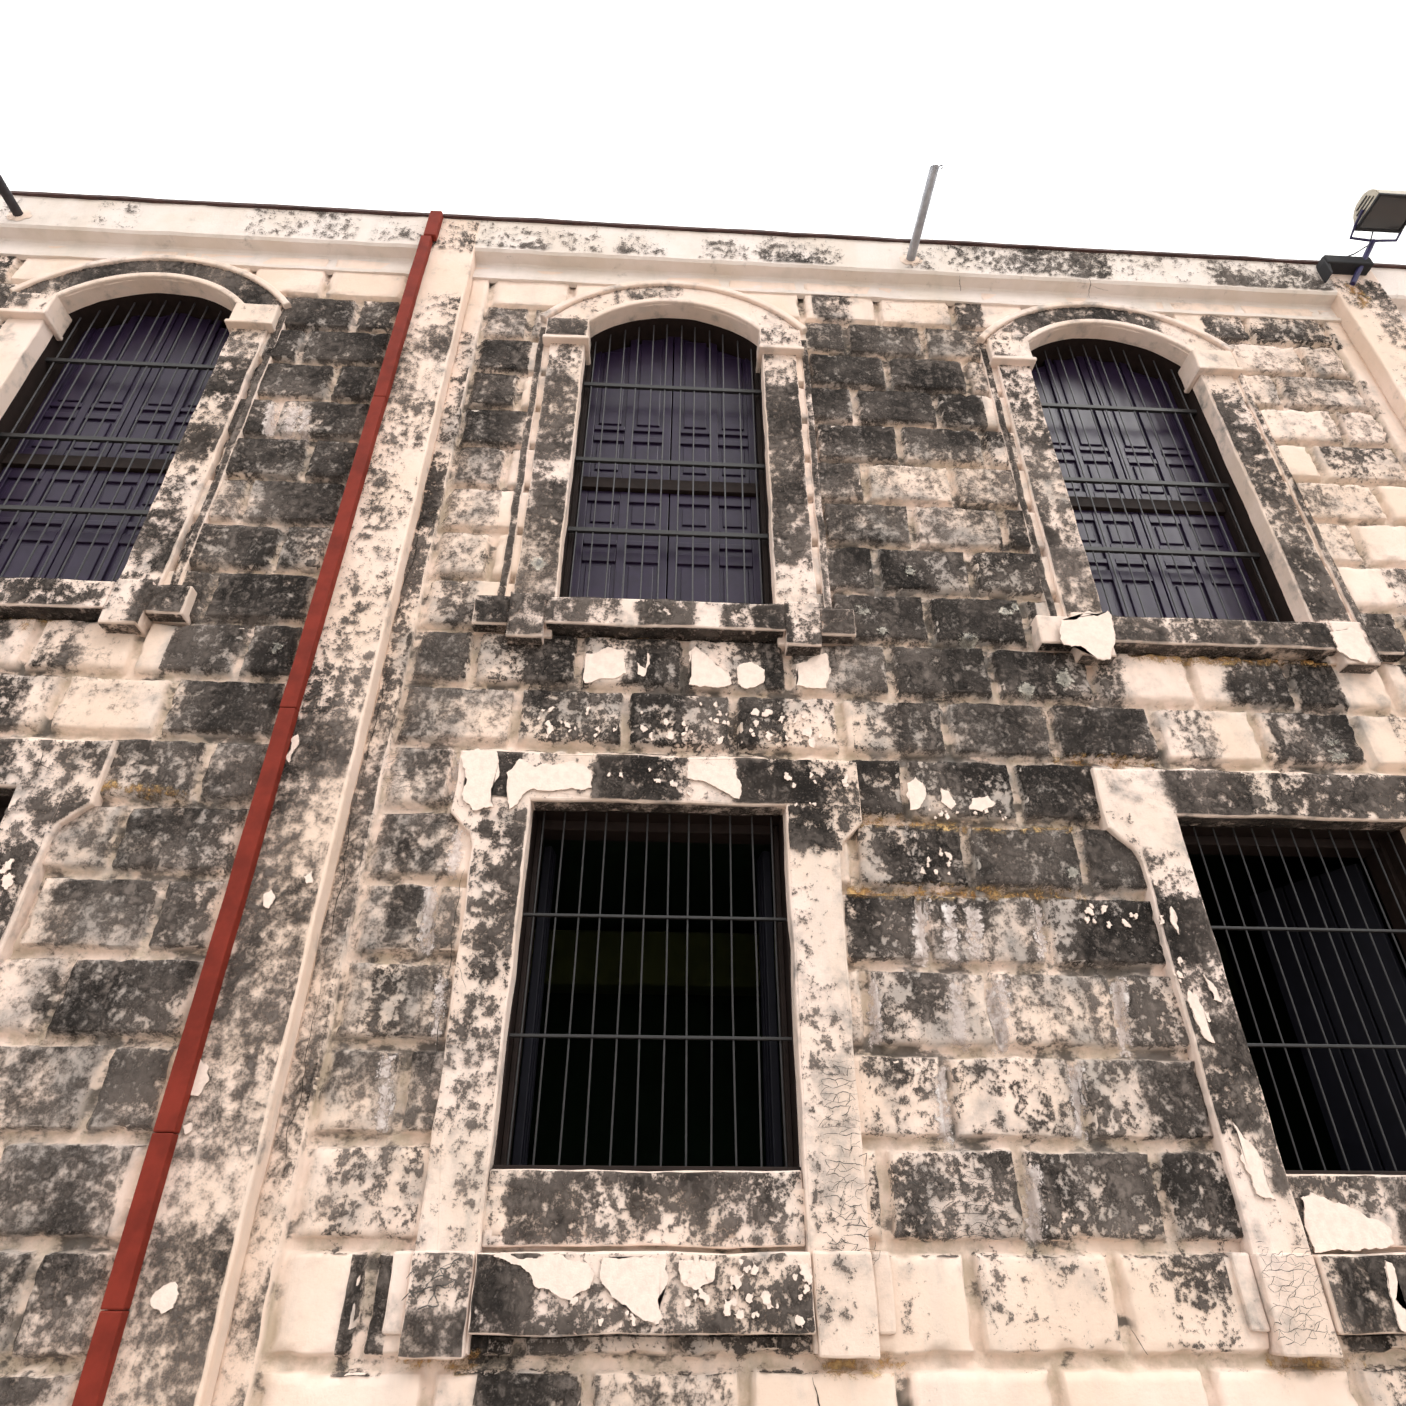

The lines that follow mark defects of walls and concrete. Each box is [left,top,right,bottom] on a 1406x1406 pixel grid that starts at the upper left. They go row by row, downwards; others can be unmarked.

damp [245,208,665,255]
damp [699,234,842,264]
damp [906,245,1406,349]
peeling [583,647,650,683]
peeling [689,647,765,745]
peeling [796,653,831,689]
peeling [460,748,623,811]
peeling [648,763,742,799]
damp [0,256,400,1406]
damp [108,286,1406,1406]
peeling [494,1252,779,1327]
peeling [1301,1192,1406,1332]